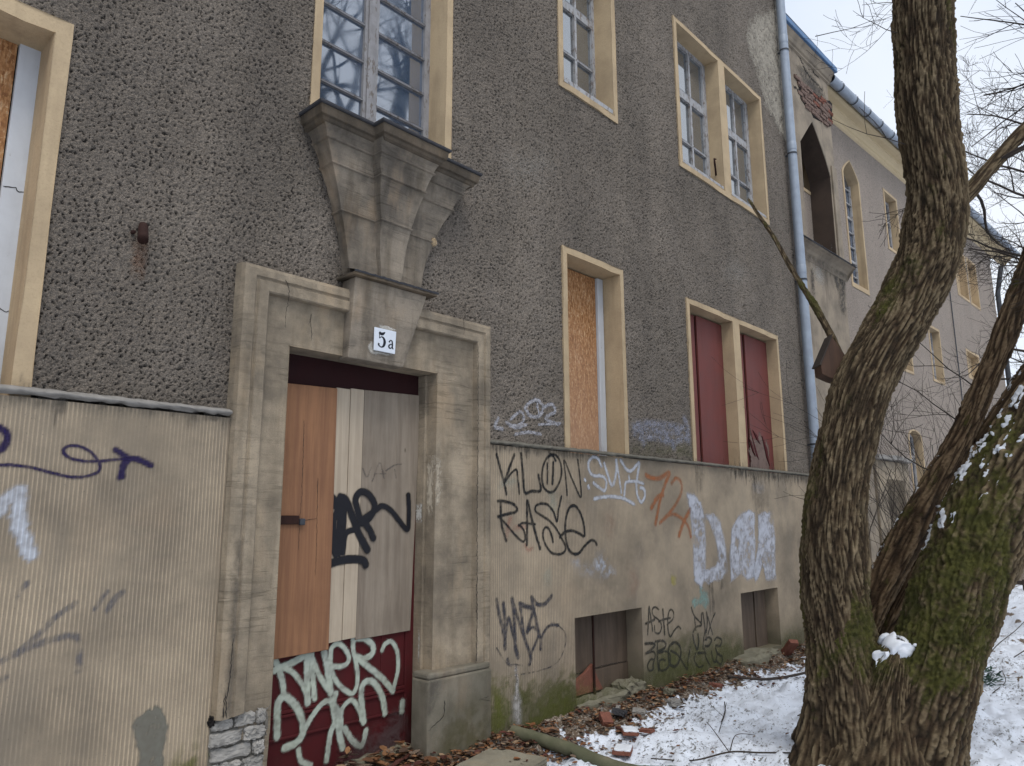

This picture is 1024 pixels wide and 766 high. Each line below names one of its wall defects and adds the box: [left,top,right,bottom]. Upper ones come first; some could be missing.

peeling [747,7,833,142]
damp [132,706,168,766]
damp [491,683,583,736]